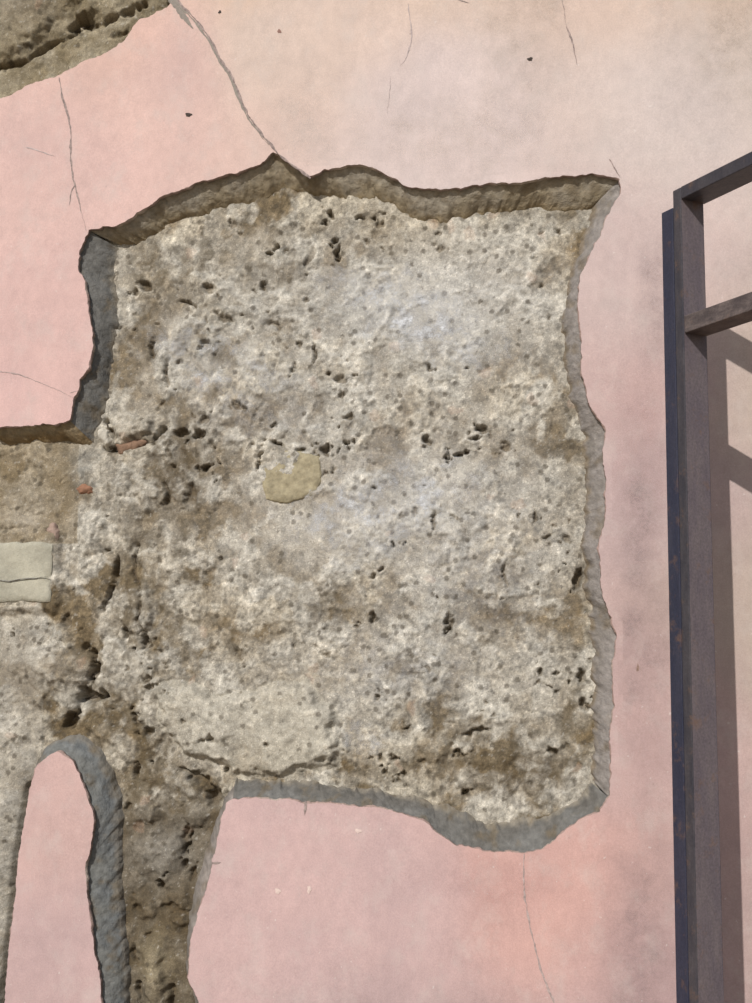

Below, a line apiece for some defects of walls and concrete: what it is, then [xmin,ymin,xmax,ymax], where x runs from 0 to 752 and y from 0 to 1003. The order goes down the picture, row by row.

crack [26,78,86,229]
spalling [0,0,170,98]
crack [168,0,311,178]
crack [562,1,578,66]
crack [0,371,75,398]
spalling [0,154,620,1003]
crack [523,854,554,1003]